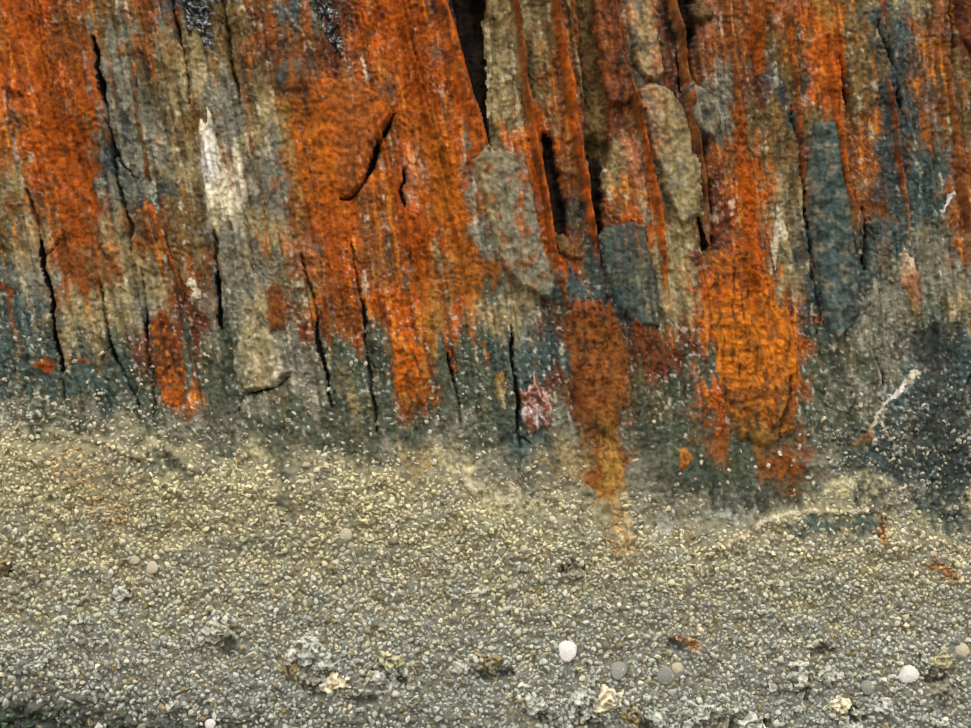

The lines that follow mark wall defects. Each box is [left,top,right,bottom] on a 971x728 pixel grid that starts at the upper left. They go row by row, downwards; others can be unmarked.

crack [39,239,66,372]
damp [0,310,121,410]
rust [0,0,124,303]
crack [92,36,108,103]
crack [315,316,329,395]
crack [360,304,368,330]
rust [273,0,582,372]
damp [435,326,526,511]
rust [572,359,634,553]
damp [628,356,893,547]
rust [803,121,860,341]
damp [850,317,971,542]